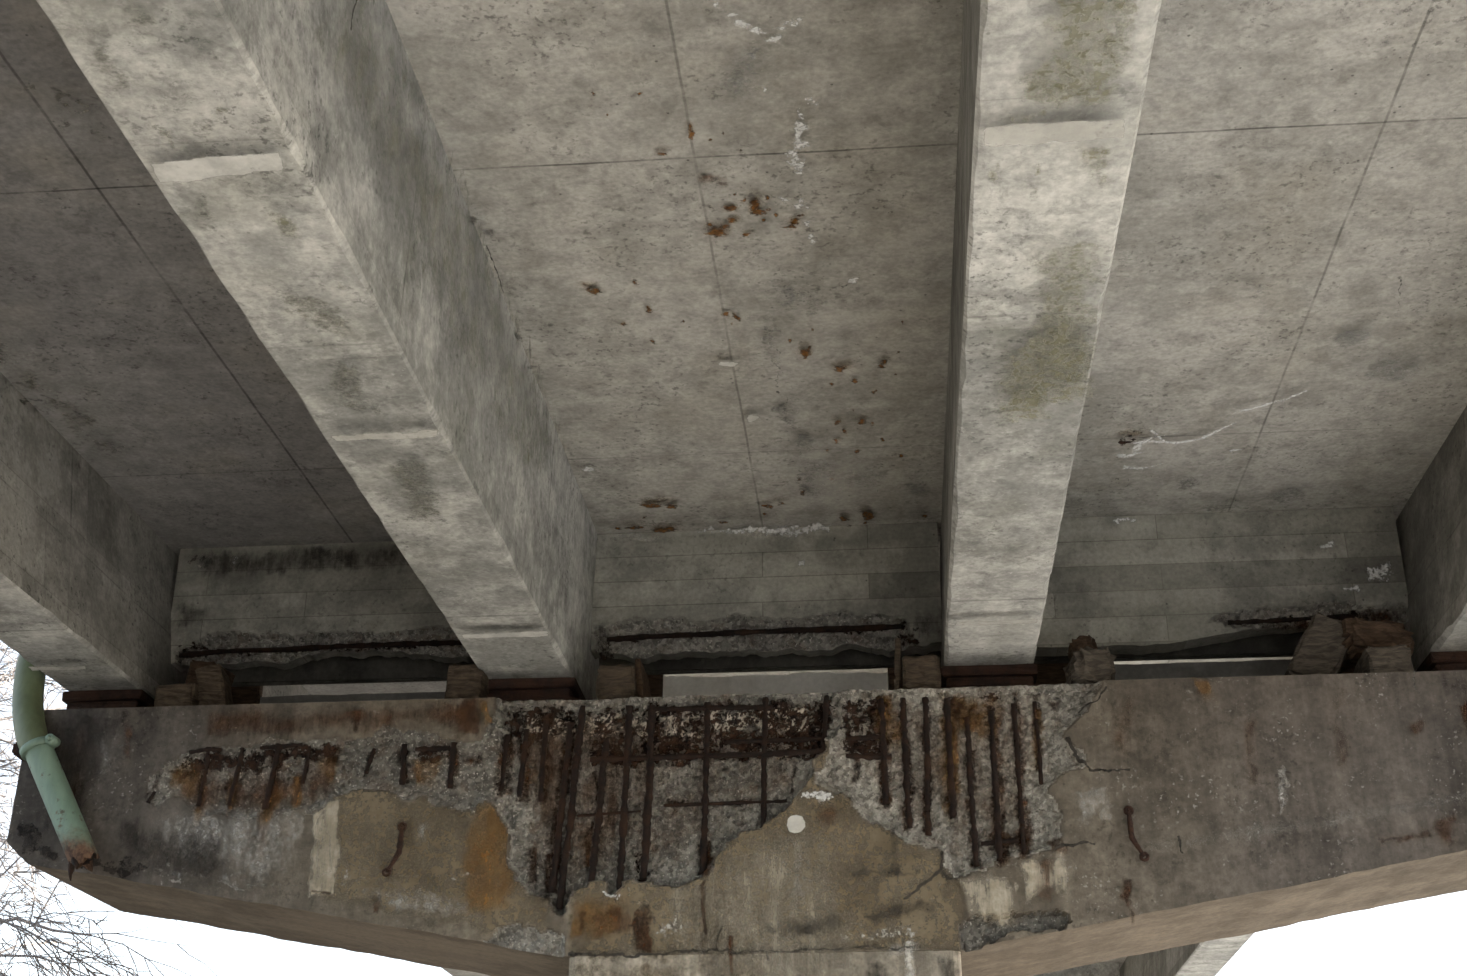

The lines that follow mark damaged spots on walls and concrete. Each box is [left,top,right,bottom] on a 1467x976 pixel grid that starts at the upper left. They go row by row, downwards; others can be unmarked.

water stain [713,2,802,42]
efflorescence [785,98,817,174]
rust [701,176,804,238]
crack [1111,390,1307,501]
rust [615,500,676,533]
spalling [175,626,470,665]
spalling [591,611,919,660]
crack [1065,686,1130,772]
spalling [146,681,1102,957]